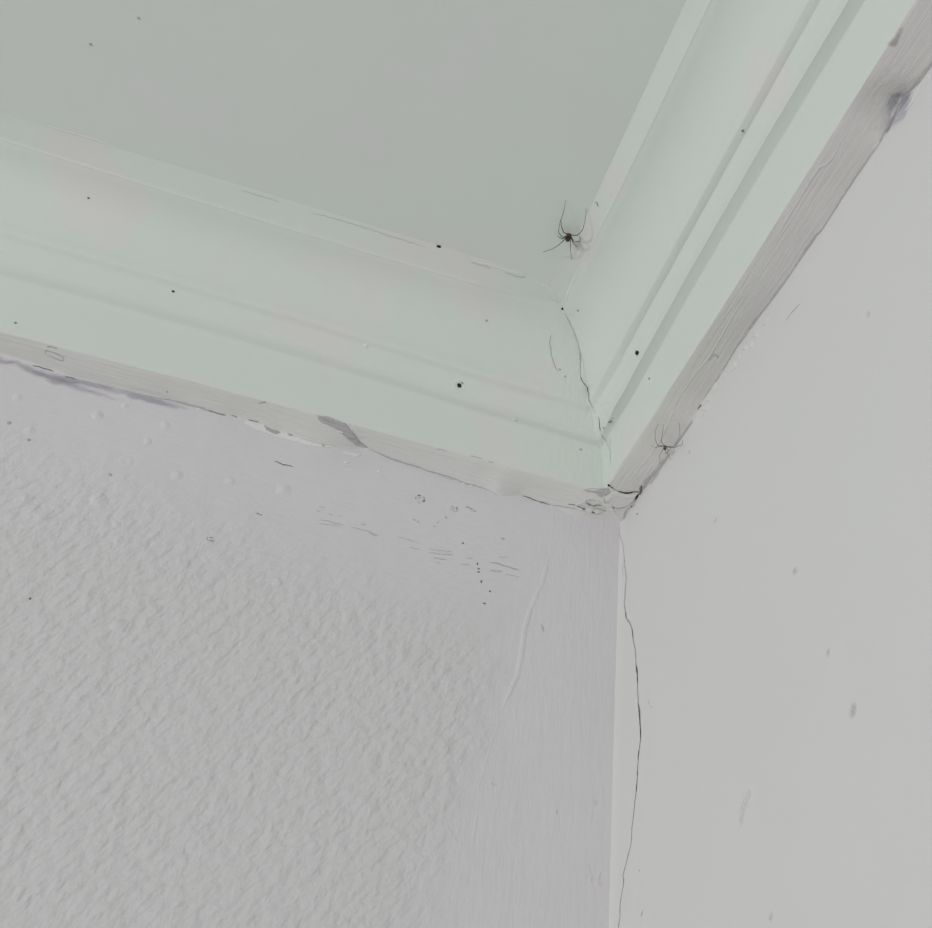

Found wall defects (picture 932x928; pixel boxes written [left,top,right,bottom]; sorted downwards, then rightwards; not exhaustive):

peeling [316,415,367,448]
crack [549,314,611,462]
peeling [573,488,636,514]
crack [604,62,932,926]